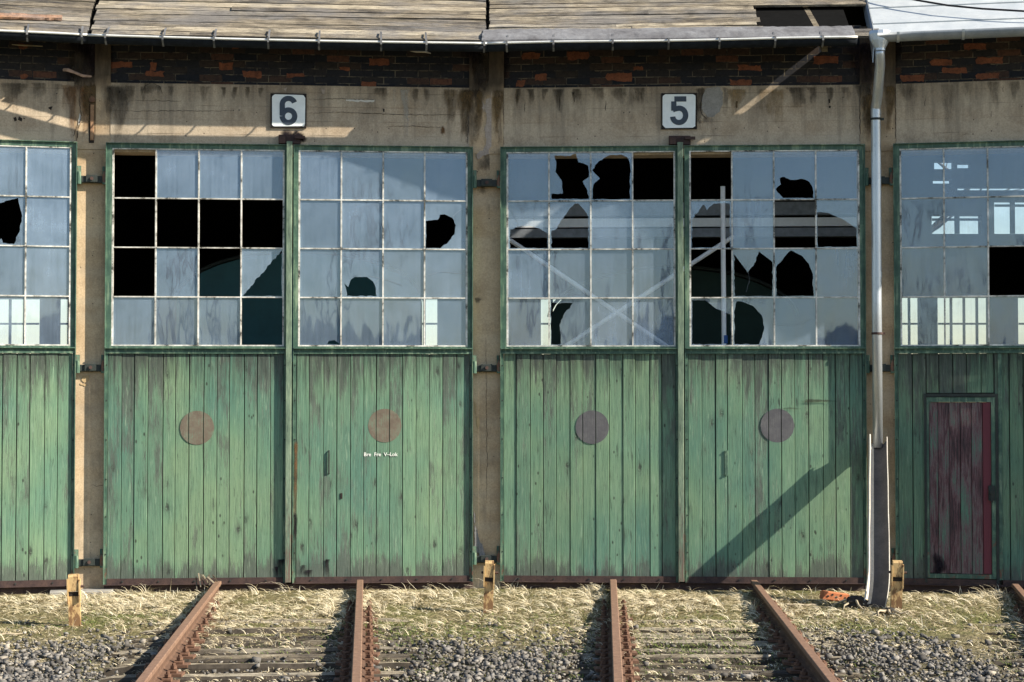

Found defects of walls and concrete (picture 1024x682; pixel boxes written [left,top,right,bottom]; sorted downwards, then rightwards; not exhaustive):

damp [445,52,508,131]